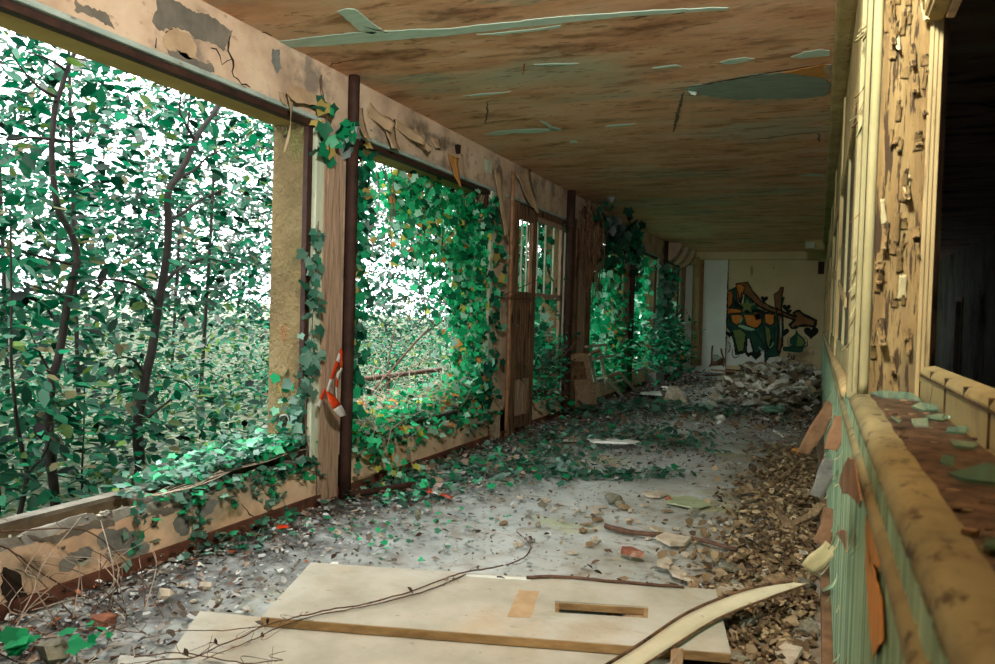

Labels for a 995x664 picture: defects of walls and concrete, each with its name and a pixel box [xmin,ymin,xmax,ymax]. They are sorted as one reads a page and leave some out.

peeling [74,0,114,28]
peeling [152,0,232,73]
crack [211,31,250,87]
flaking render [271,7,728,73]
peeling [884,0,930,116]
peeling [889,100,923,152]
peeling [874,168,921,307]
peeling [870,318,887,360]
peeling [27,498,219,572]
peeling [678,392,884,664]
spalling [0,567,28,602]